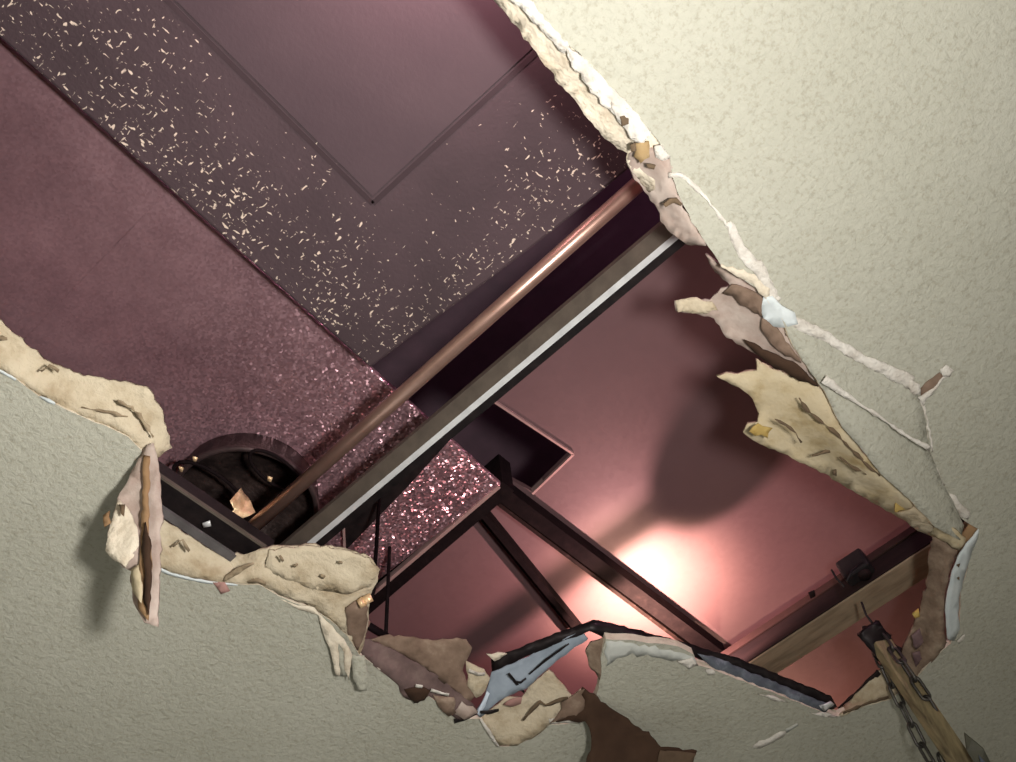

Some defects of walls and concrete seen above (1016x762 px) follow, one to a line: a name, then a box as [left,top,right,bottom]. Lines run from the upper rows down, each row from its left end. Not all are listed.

flaking render [494,0,707,246]
crack [668,172,915,389]
flaking render [0,319,172,458]
crack [821,375,931,451]
flaking render [716,358,977,676]
flaking render [160,519,380,654]
flaking render [480,669,585,747]
peeling [585,637,716,680]
flaking render [810,669,897,717]